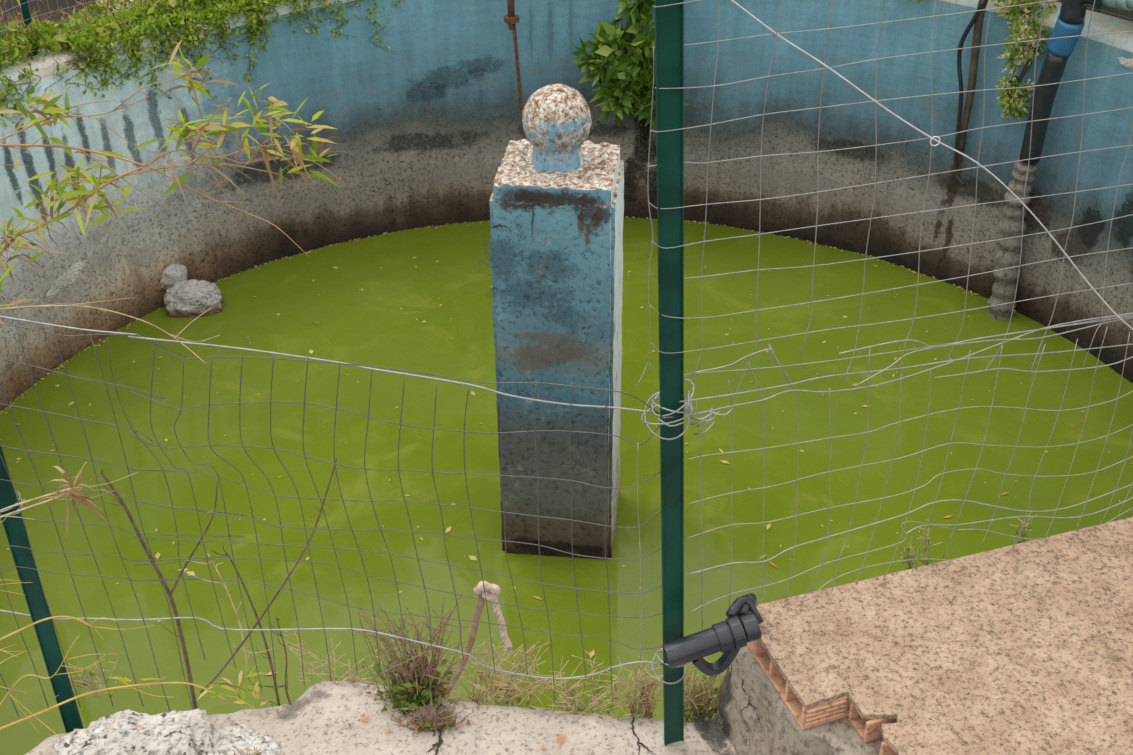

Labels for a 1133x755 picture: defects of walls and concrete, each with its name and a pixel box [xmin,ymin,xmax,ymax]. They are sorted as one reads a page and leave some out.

water stain [389,132,477,152]
water stain [815,139,883,161]
water stain [235,156,337,185]
water stain [937,176,1004,205]
corrosion [578,211,602,244]
water stain [1024,193,1133,265]